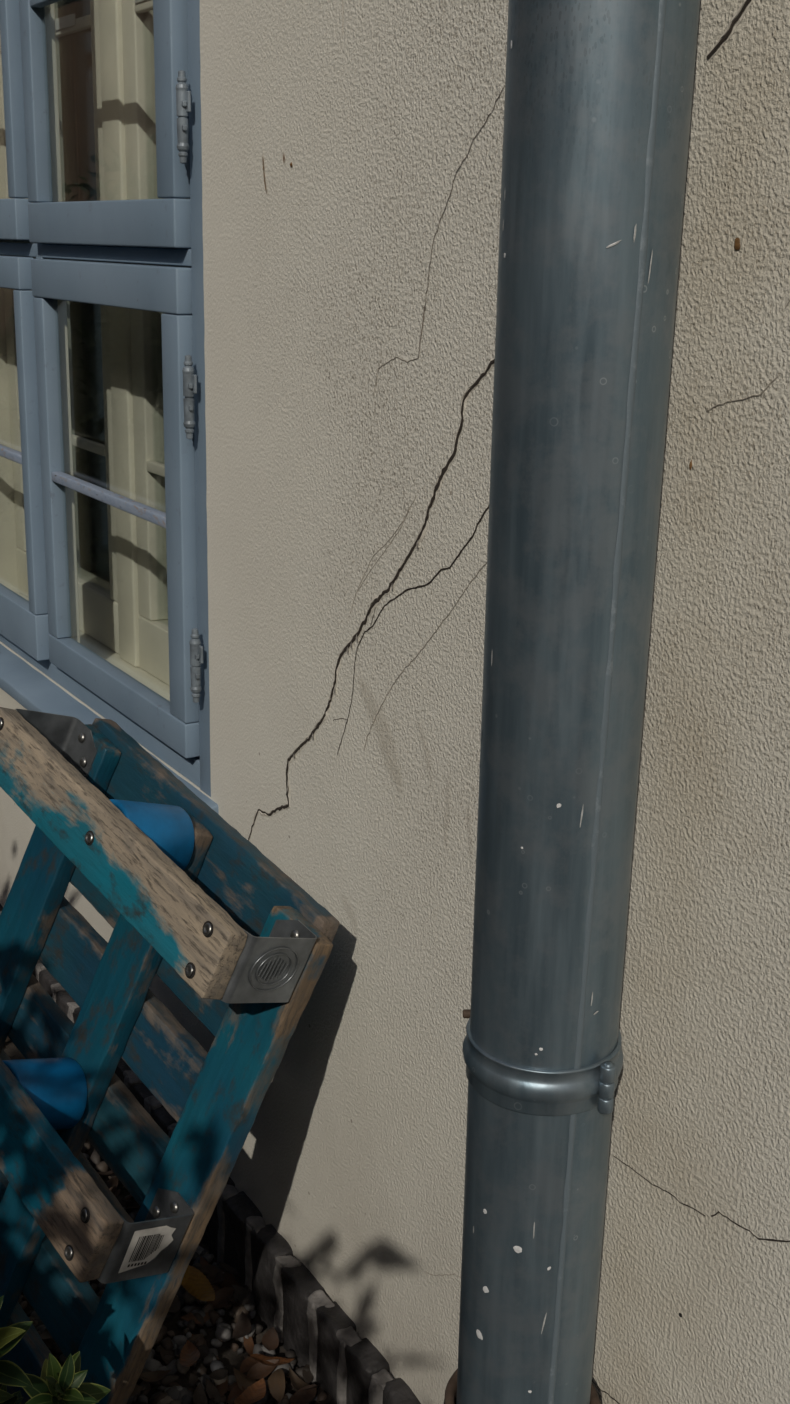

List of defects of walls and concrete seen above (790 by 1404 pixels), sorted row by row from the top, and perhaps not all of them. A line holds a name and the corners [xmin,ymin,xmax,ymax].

crack [707,0,753,61]
crack [248,357,495,841]
crack [613,1155,790,1242]